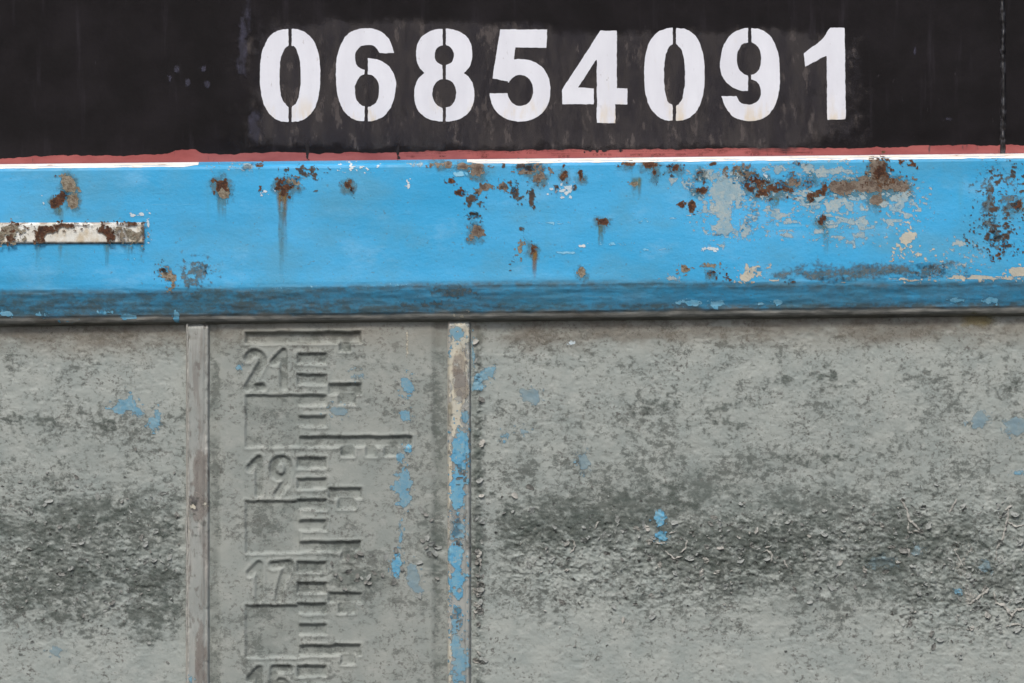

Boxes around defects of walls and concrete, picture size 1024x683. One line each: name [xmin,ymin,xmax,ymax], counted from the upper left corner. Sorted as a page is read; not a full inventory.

rust [0,173,149,250]
rust [210,175,232,199]
rust [260,161,381,210]
rust [426,158,586,244]
rust [509,227,538,271]
rust [617,160,685,186]
rust [676,151,918,215]
peeling [659,160,1024,284]
rust [945,158,1024,276]
peeling [330,311,533,683]